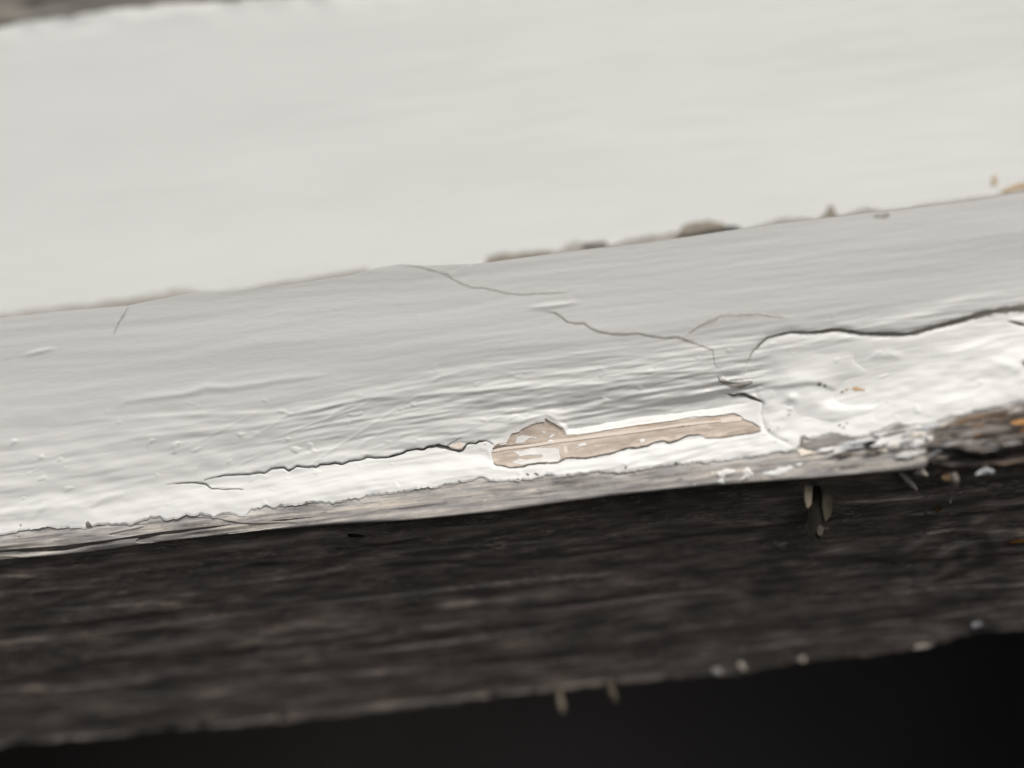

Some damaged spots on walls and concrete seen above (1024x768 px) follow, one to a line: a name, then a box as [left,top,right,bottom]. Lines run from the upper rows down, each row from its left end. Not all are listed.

crack [553,304,1024,444]
crack [166,437,492,490]
peeling [485,404,787,480]
peeling [711,463,802,485]
peeling [800,423,856,451]